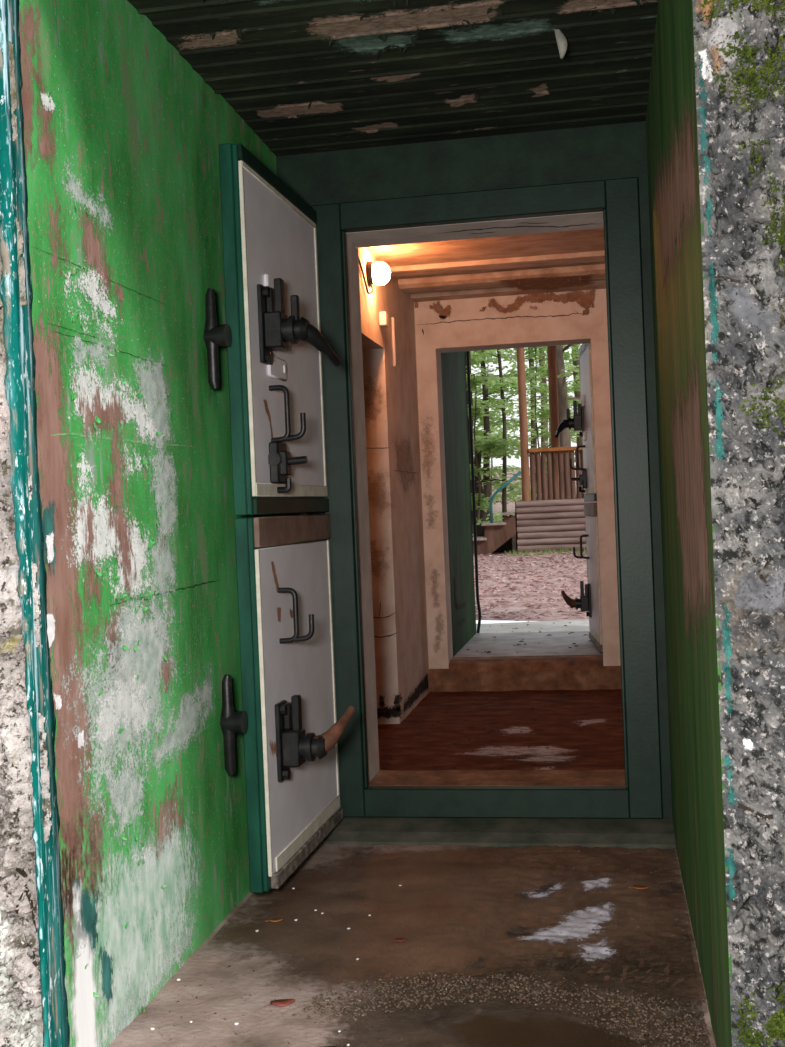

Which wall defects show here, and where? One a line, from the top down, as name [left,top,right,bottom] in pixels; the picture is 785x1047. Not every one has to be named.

peeling [174,28,243,50]
peeling [305,0,642,61]
peeling [371,73,421,82]
peeling [257,100,344,119]
peeling [353,122,398,134]
peeling [442,92,479,107]
corrosion [44,200,123,318]
spalling [414,301,452,321]
spalling [479,274,596,316]
corrosion [33,311,136,981]
peeling [46,259,216,1047]
damp [215,845,709,1047]